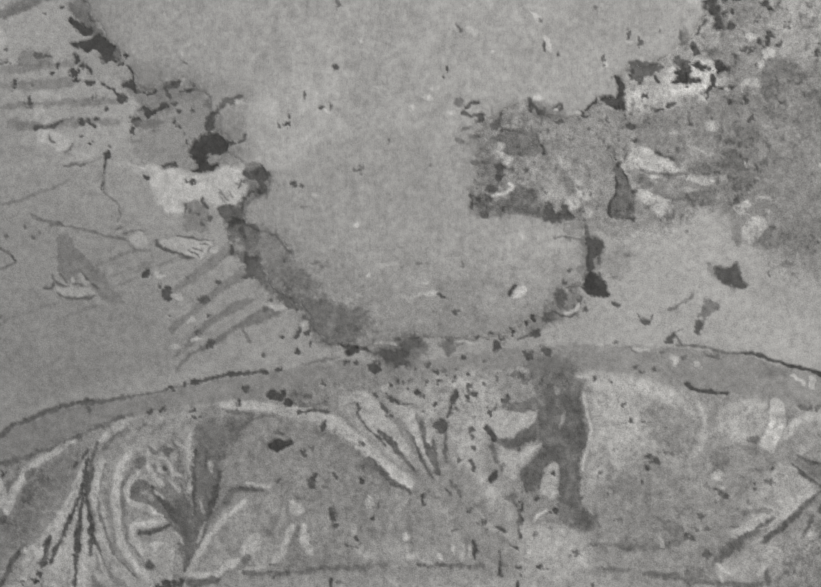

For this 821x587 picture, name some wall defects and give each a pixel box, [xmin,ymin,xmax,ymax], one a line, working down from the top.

flaking render [0,0,275,277]
hole [275,113,292,133]
hole [289,179,319,212]
flaking render [371,0,821,475]
peeling [140,268,185,318]
peeling [186,294,216,351]
flaking render [278,324,314,356]
crack [674,337,821,413]
hole [640,449,682,487]